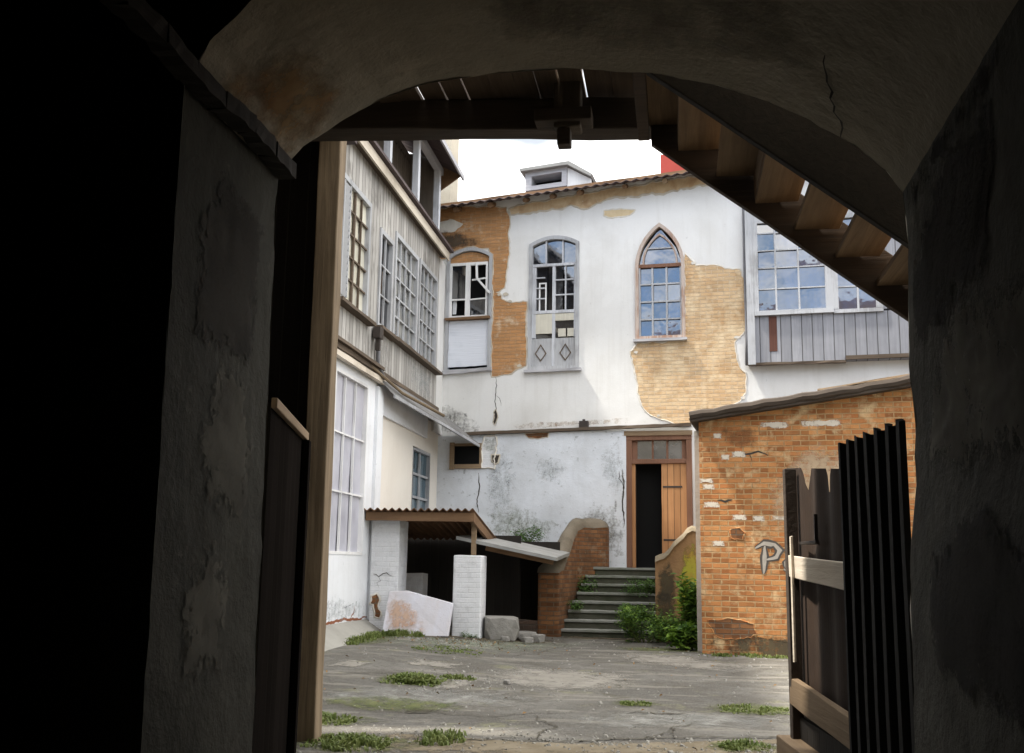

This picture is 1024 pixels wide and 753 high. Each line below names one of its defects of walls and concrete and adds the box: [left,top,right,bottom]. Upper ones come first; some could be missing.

crack [823,55,843,137]
flaking render [440,175,708,378]
flaking render [630,253,748,425]
crack [617,470,625,524]
flaking render [181,540,229,684]
spalling [707,617,758,640]